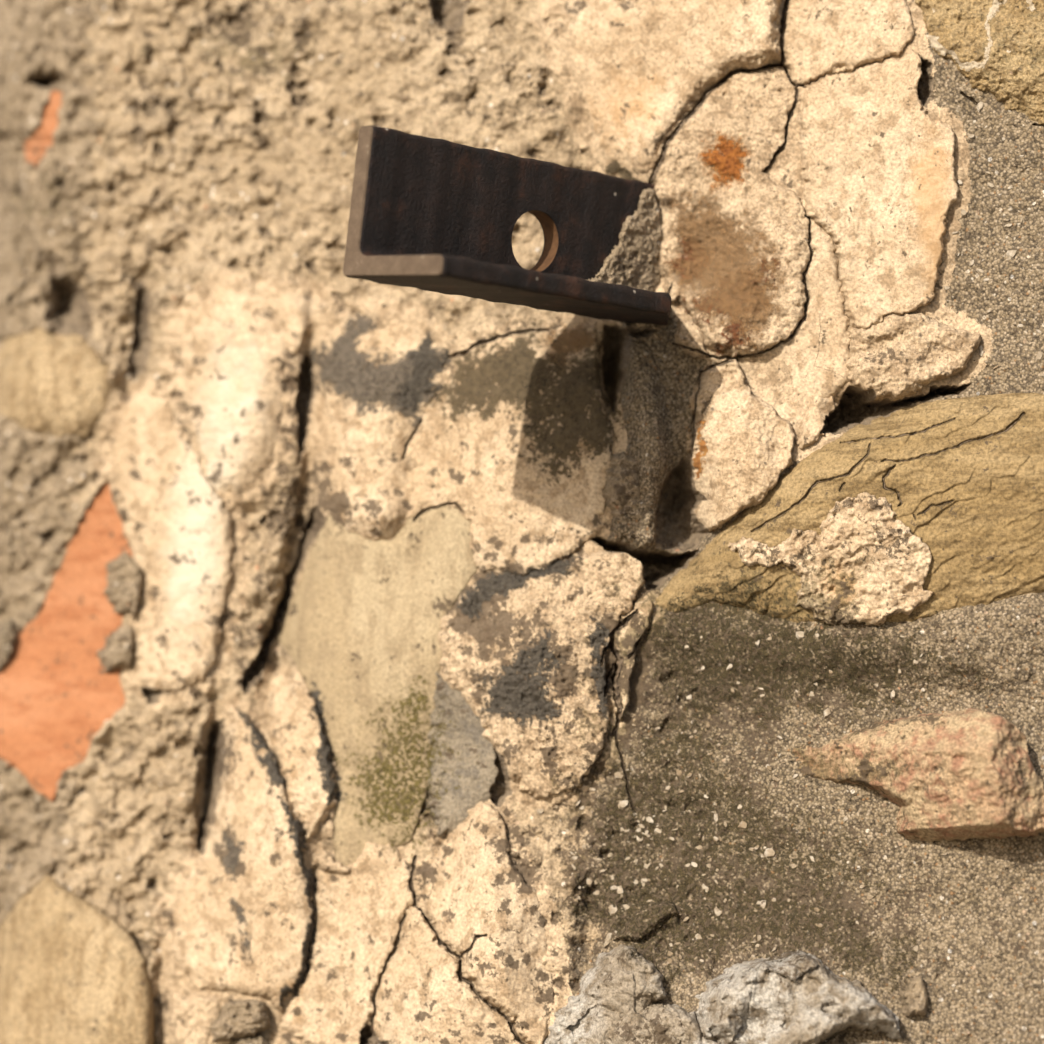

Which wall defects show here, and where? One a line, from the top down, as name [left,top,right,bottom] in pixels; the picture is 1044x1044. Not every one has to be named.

crack [650,0,804,182]
rust [655,131,790,357]
crack [673,216,843,455]
crack [753,413,1024,531]
water stain [310,675,464,859]
crack [600,610,643,815]
crack [333,856,524,1044]